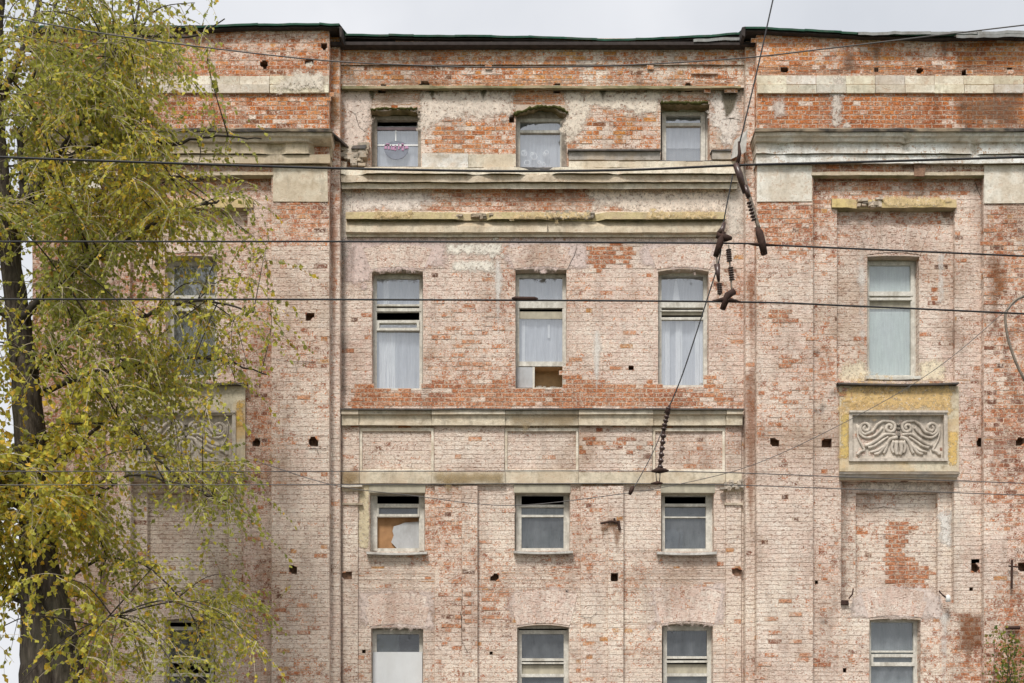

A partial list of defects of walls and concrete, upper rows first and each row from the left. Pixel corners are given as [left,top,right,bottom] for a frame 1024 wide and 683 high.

flaking render [419,117,507,153]
flaking render [559,112,643,144]
flaking render [582,243,636,273]
flaking render [347,301,743,408]
flaking render [882,521,936,588]